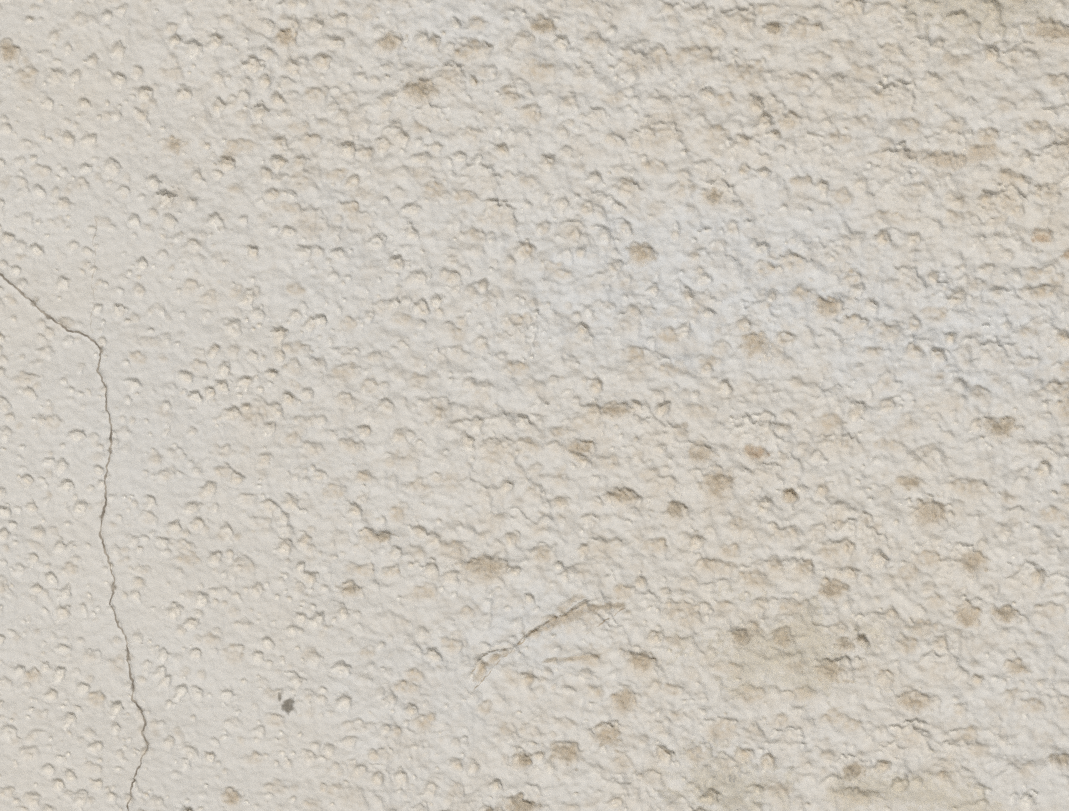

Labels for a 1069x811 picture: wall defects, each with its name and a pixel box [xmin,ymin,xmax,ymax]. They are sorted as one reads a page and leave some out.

crack [0,211,148,811]